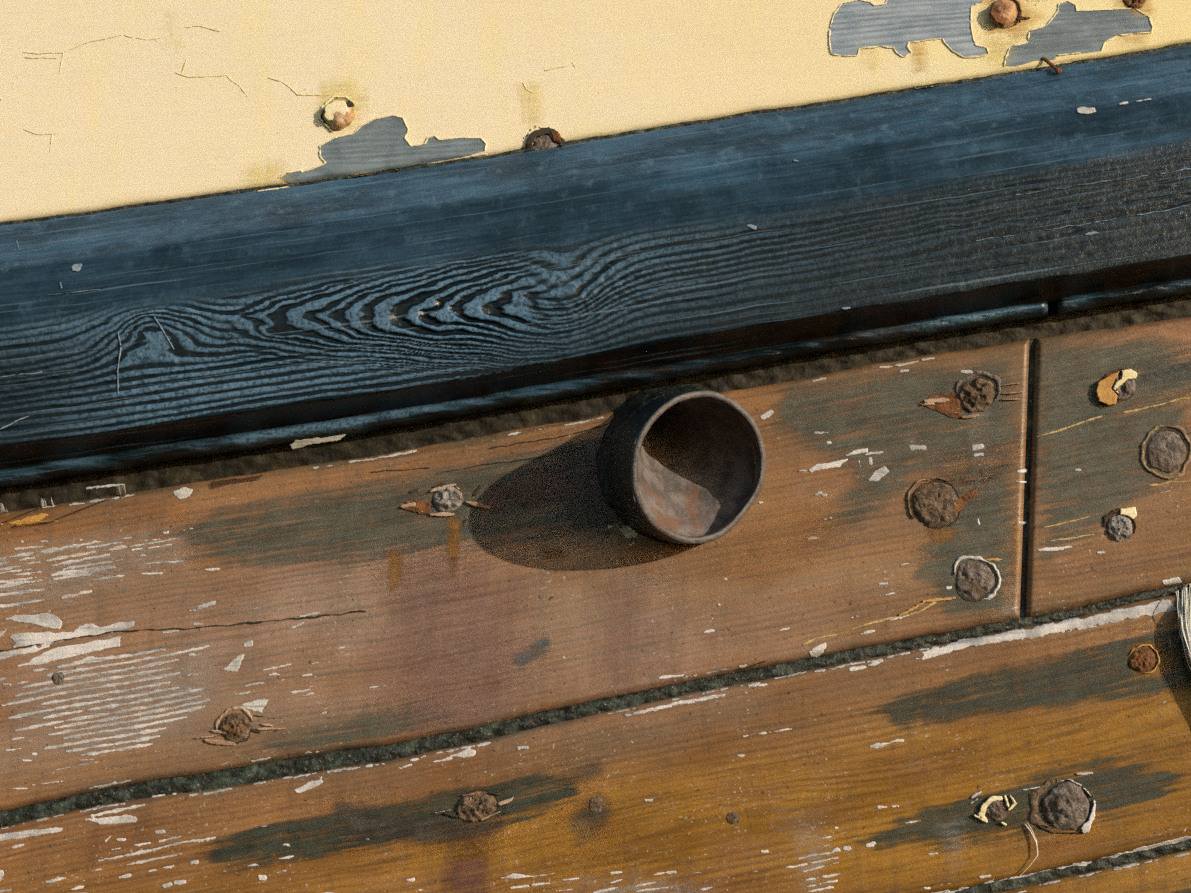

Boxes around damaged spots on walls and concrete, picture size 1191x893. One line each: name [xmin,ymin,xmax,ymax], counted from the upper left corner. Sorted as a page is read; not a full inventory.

crack [0,26,220,101]
crack [175,59,344,96]
peeling [828,0,989,58]
rust [987,0,1035,33]
peeling [1003,1,1153,73]
peeling [257,115,487,192]
crack [0,610,366,652]
peeling [253,763,384,793]
peeling [399,742,491,769]
peeling [0,814,63,849]
peeling [79,788,232,888]
peeling [979,836,1191,893]